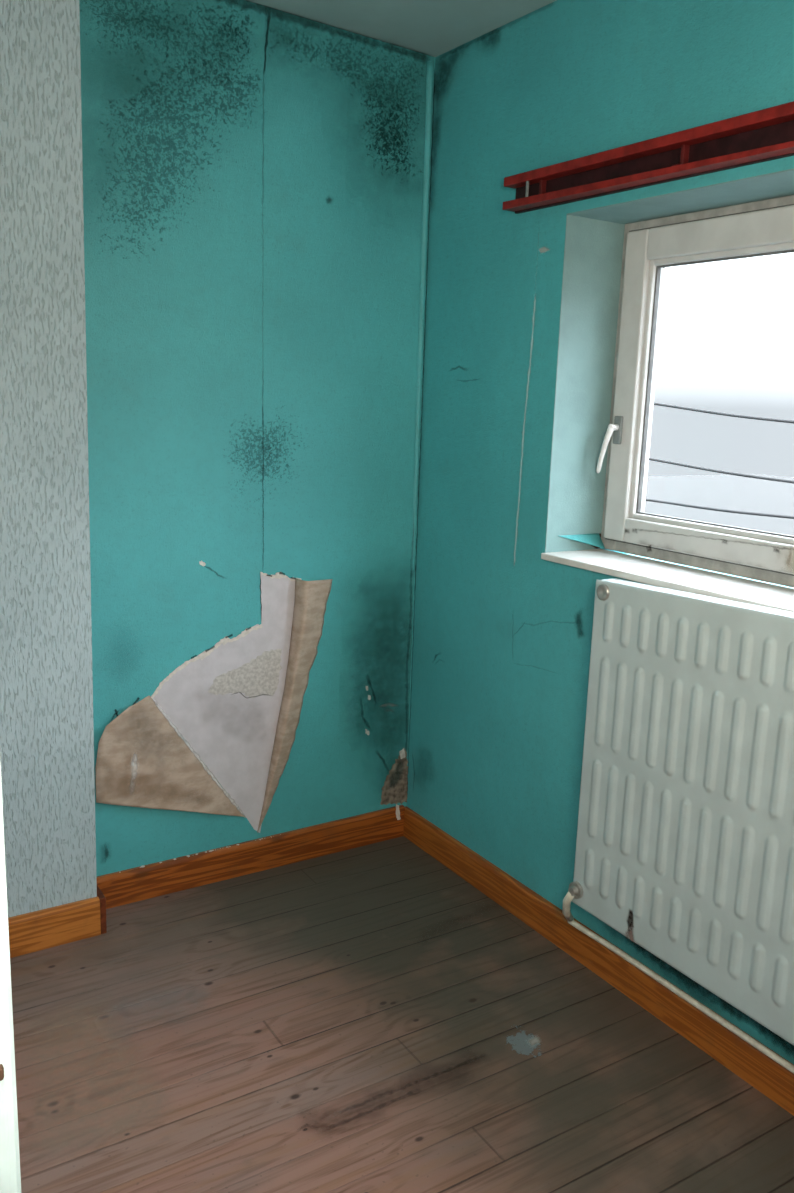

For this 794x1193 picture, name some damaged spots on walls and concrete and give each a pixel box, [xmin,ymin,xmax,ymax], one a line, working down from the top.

crack [263,16,271,71]
flaking render [380,748,408,820]
water stain [632,941,794,1050]